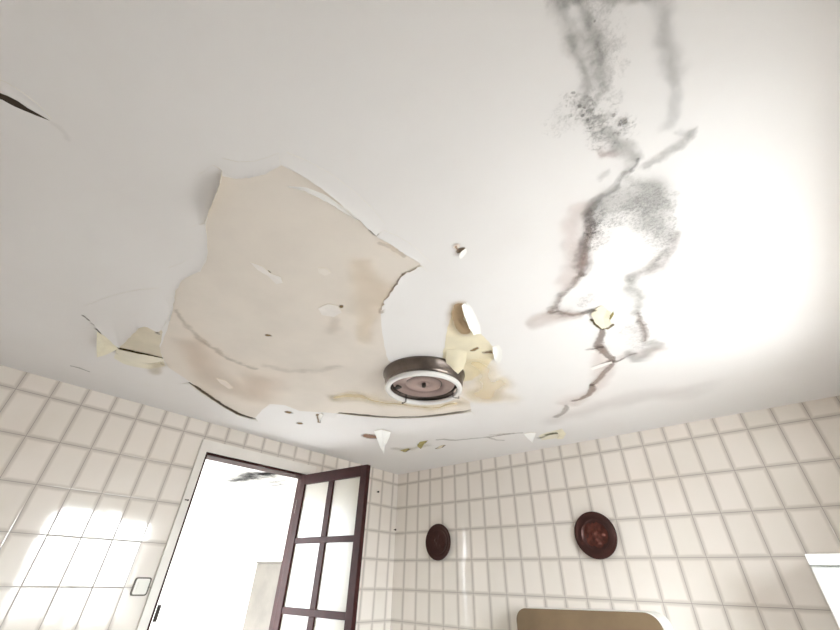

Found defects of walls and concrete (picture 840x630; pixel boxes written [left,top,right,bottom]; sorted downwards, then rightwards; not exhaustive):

crack [0,80,52,120]
peeling [82,152,475,453]
peeling [443,302,502,382]
peeling [590,306,614,329]